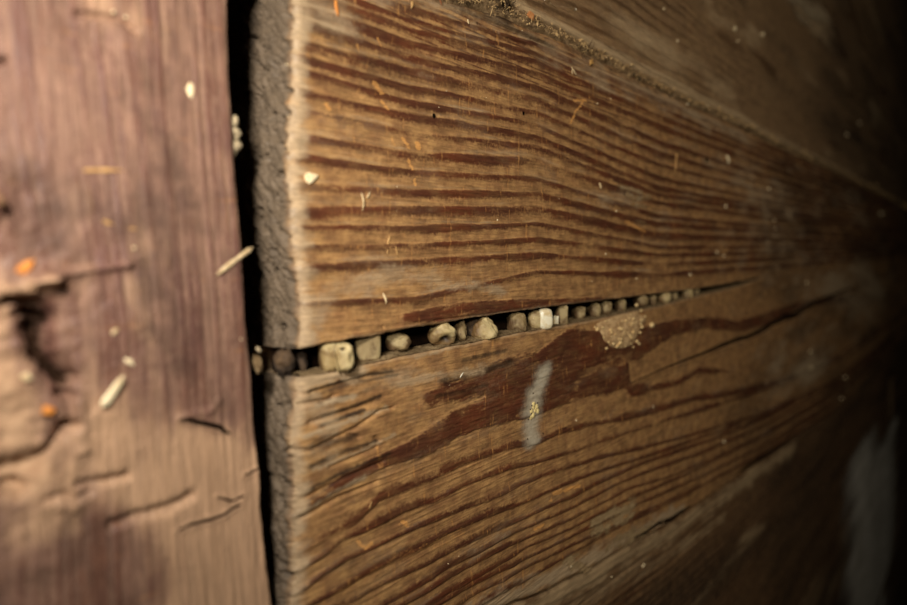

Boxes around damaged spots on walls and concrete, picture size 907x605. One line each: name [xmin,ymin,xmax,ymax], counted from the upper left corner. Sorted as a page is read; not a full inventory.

crack [631,287,855,383]
crack [180,419,231,435]
crack [180,468,259,530]